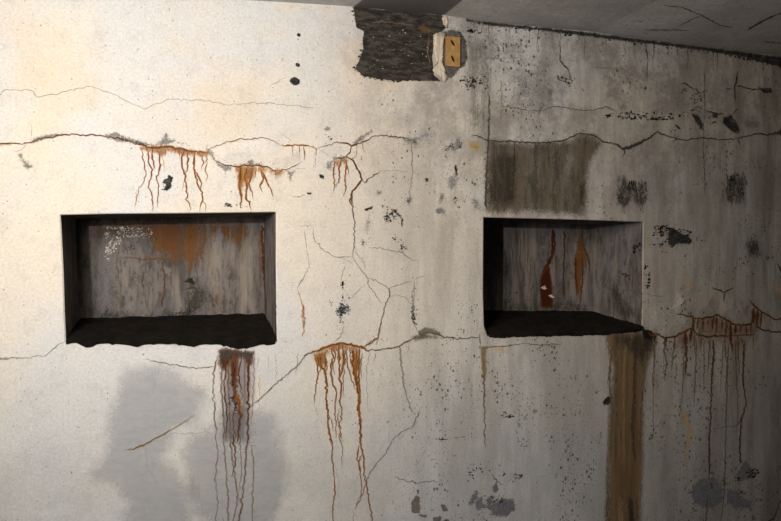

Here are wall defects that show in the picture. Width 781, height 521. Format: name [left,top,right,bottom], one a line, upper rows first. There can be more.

crack [0,78,313,109]
corrosion [135,145,209,212]
corrosion [235,165,282,209]
damp [436,165,462,220]
damp [445,118,602,216]
crack [503,104,614,117]
crack [451,130,781,155]
crack [0,125,478,521]
crack [649,287,781,339]
corrosion [212,348,260,521]
corrosion [313,330,380,521]
corrosion [602,308,771,521]